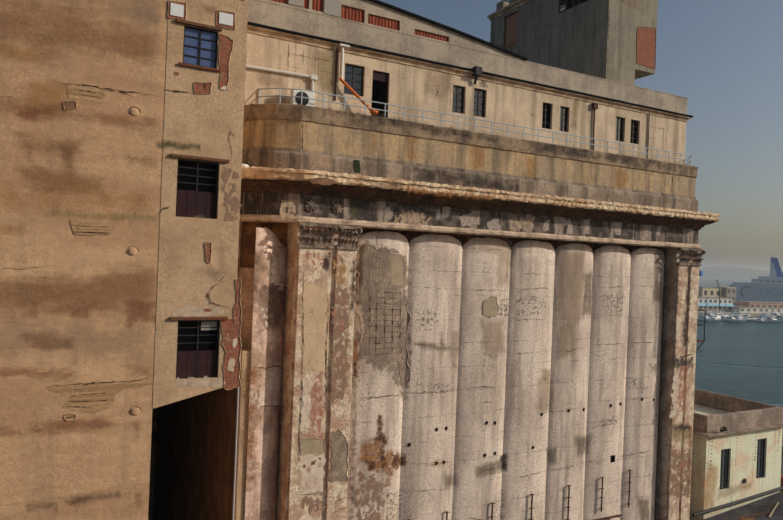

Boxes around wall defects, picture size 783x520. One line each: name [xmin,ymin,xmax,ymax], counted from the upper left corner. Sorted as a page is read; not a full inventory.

spalling [193,10,236,95]
crack [45,79,191,97]
flaking render [280,197,298,222]
flaking render [393,209,431,225]
flaking render [509,216,536,232]
spalling [172,278,242,390]
spalling [46,378,154,422]
spalling [298,239,455,520]
rust [360,415,407,486]